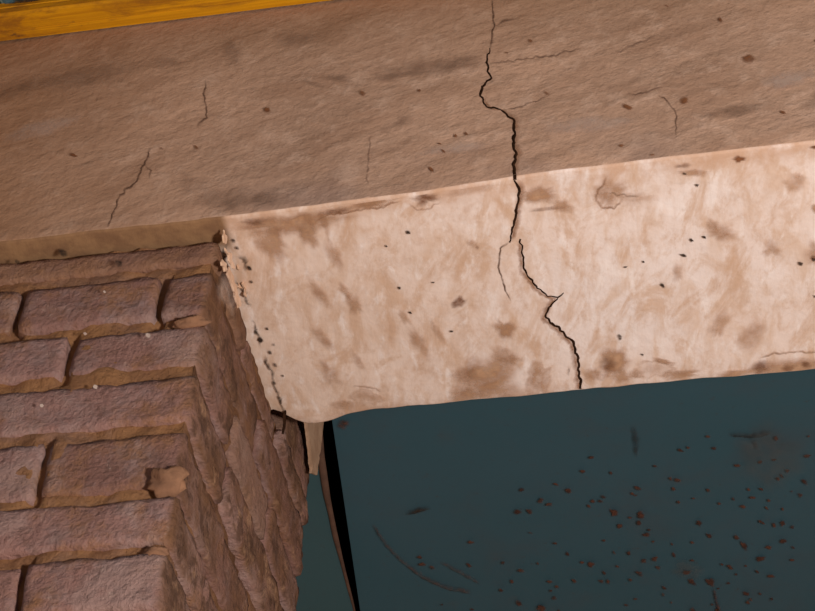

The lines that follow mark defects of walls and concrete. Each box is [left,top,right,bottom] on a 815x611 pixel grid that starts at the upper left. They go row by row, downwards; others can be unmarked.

crack [479,5,582,389]
flaking render [220,230,253,308]
flaking render [265,351,286,434]